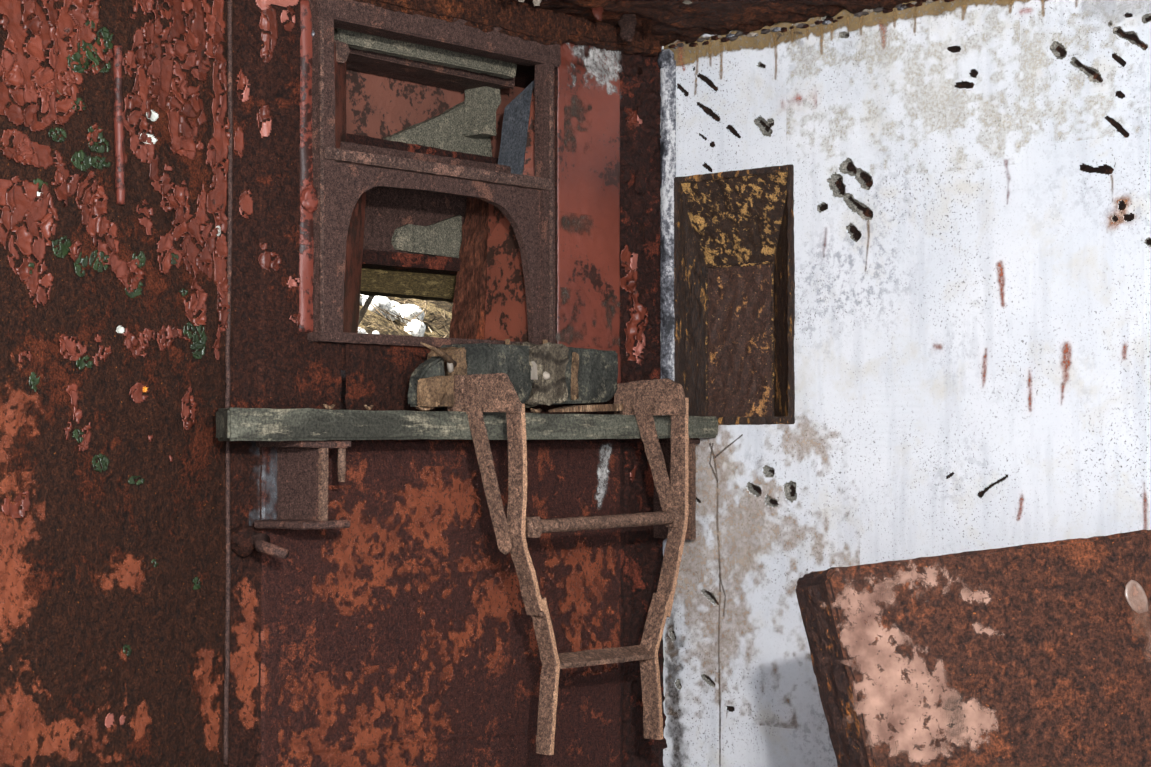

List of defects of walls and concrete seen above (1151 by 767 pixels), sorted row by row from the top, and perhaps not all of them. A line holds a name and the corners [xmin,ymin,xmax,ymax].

leakage [664,0,1048,94]
spalling [1050,41,1103,84]
spalling [1105,116,1129,138]
peeling [0,0,253,370]
spalling [817,158,873,252]
spalling [1080,163,1134,226]
rust [1061,343,1071,399]
rust [0,383,46,650]
spalling [746,465,797,508]
rust [278,466,542,767]
rust [193,577,270,752]
rust [0,658,152,767]